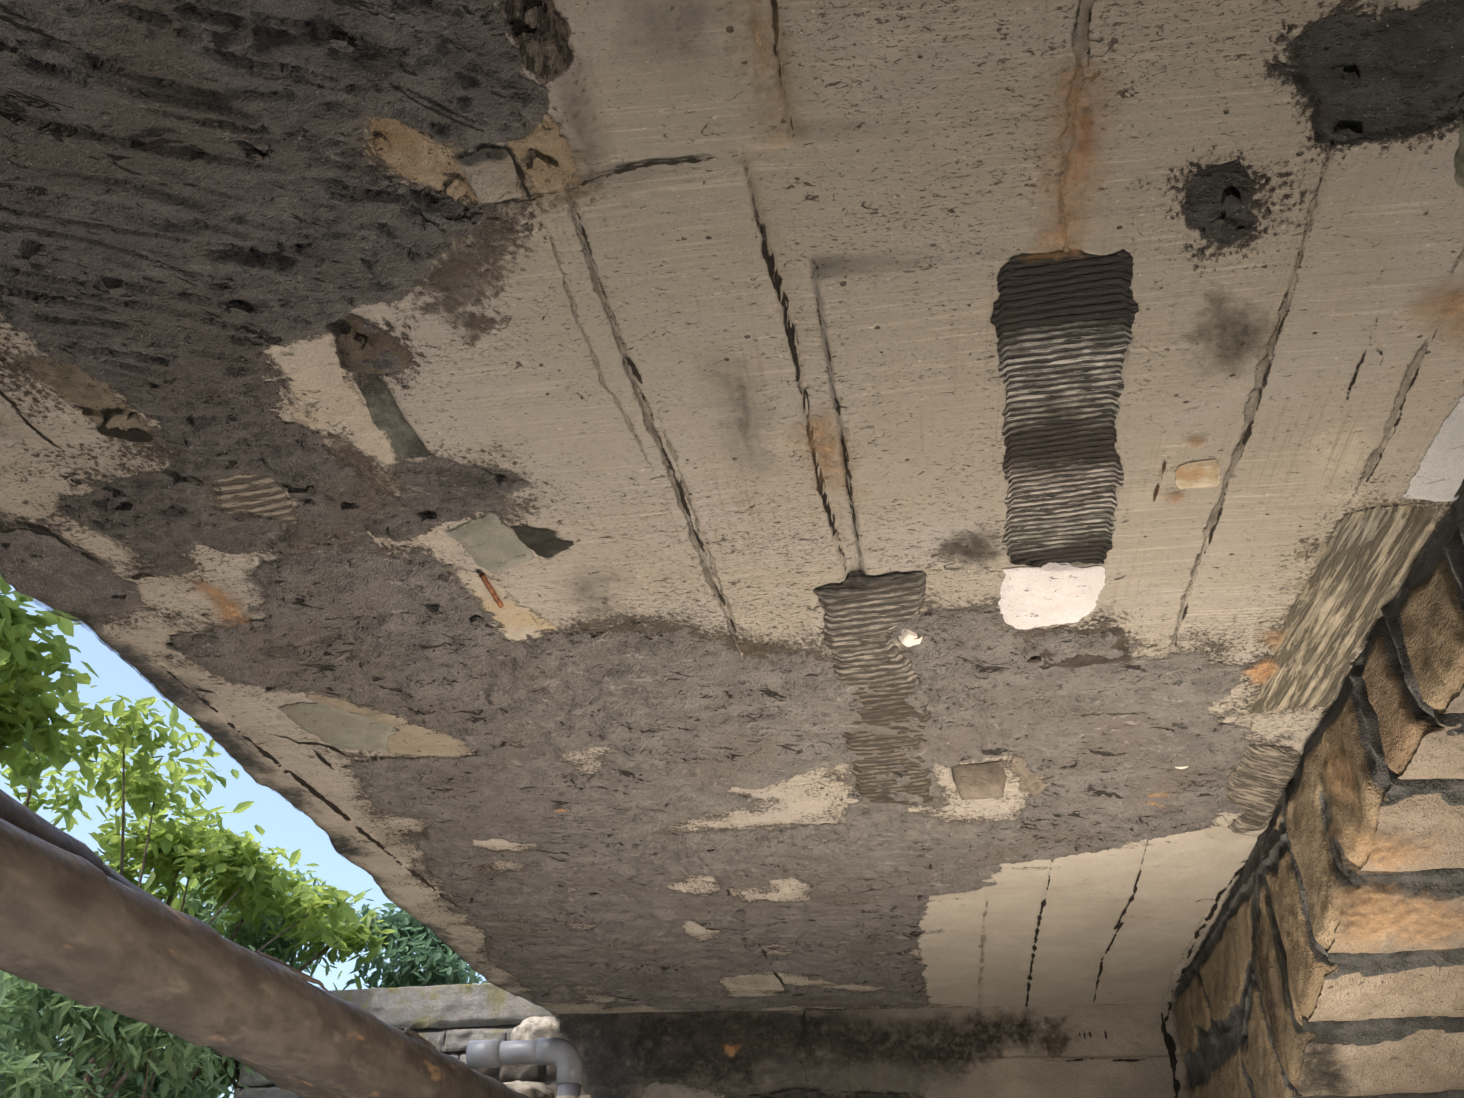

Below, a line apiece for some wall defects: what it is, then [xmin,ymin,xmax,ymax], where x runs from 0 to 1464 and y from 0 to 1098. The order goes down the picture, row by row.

crack [770,0,793,130]
crack [1086,4,1094,66]
spalling [1125,0,1464,283]
crack [367,39,861,640]
peeling [1174,459,1221,489]
crack [1199,220,1314,565]
crack [155,663,482,929]
crack [1025,860,1053,1007]
water stain [1043,1019,1069,1055]
crack [1044,840,1248,1098]